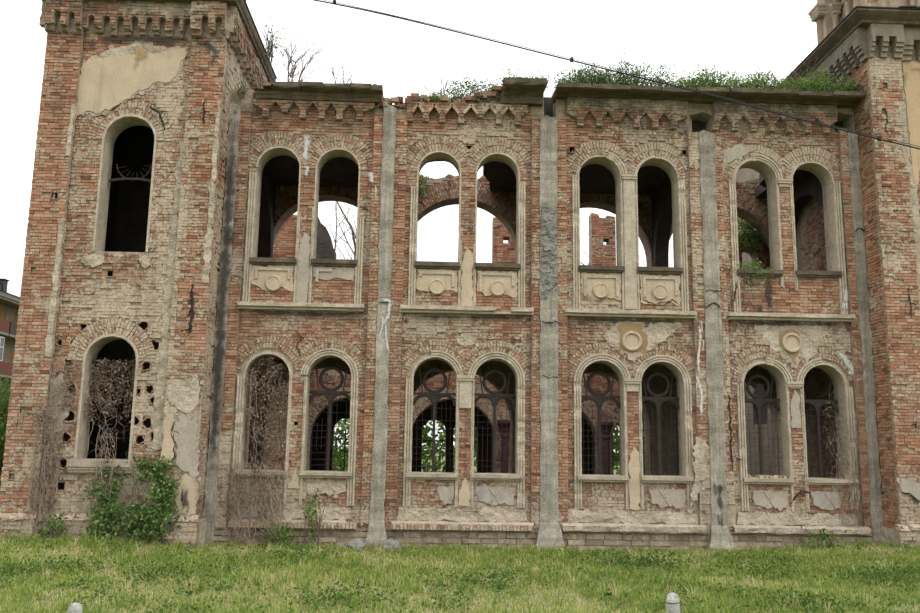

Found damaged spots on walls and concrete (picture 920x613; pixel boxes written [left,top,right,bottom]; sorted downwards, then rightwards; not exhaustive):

water stain [87,35,175,69]
flaking render [77,33,190,117]
flaking render [46,323,91,444]
spalling [112,315,162,372]
crack [181,284,199,335]
water stain [379,299,391,350]
water stain [570,318,673,332]
water stain [689,321,704,412]
flaking render [129,374,205,516]
flaking render [896,474,920,507]